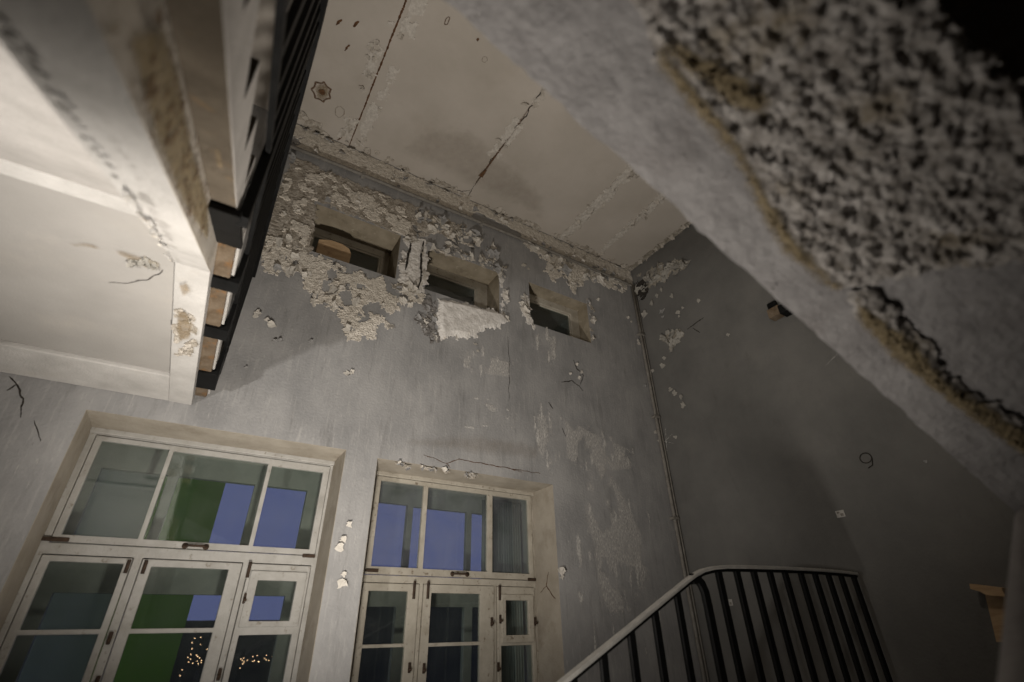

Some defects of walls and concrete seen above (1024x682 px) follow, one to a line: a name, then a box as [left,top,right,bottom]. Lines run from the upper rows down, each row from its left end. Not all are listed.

crack [338,0,407,146]
crack [450,92,541,195]
peeling [122,190,174,271]
peeling [261,39,692,372]
spalling [630,0,1024,432]
spalling [171,308,199,357]
peeling [253,310,276,328]
crack [7,376,41,441]
crack [424,455,540,474]
peeling [335,521,352,552]